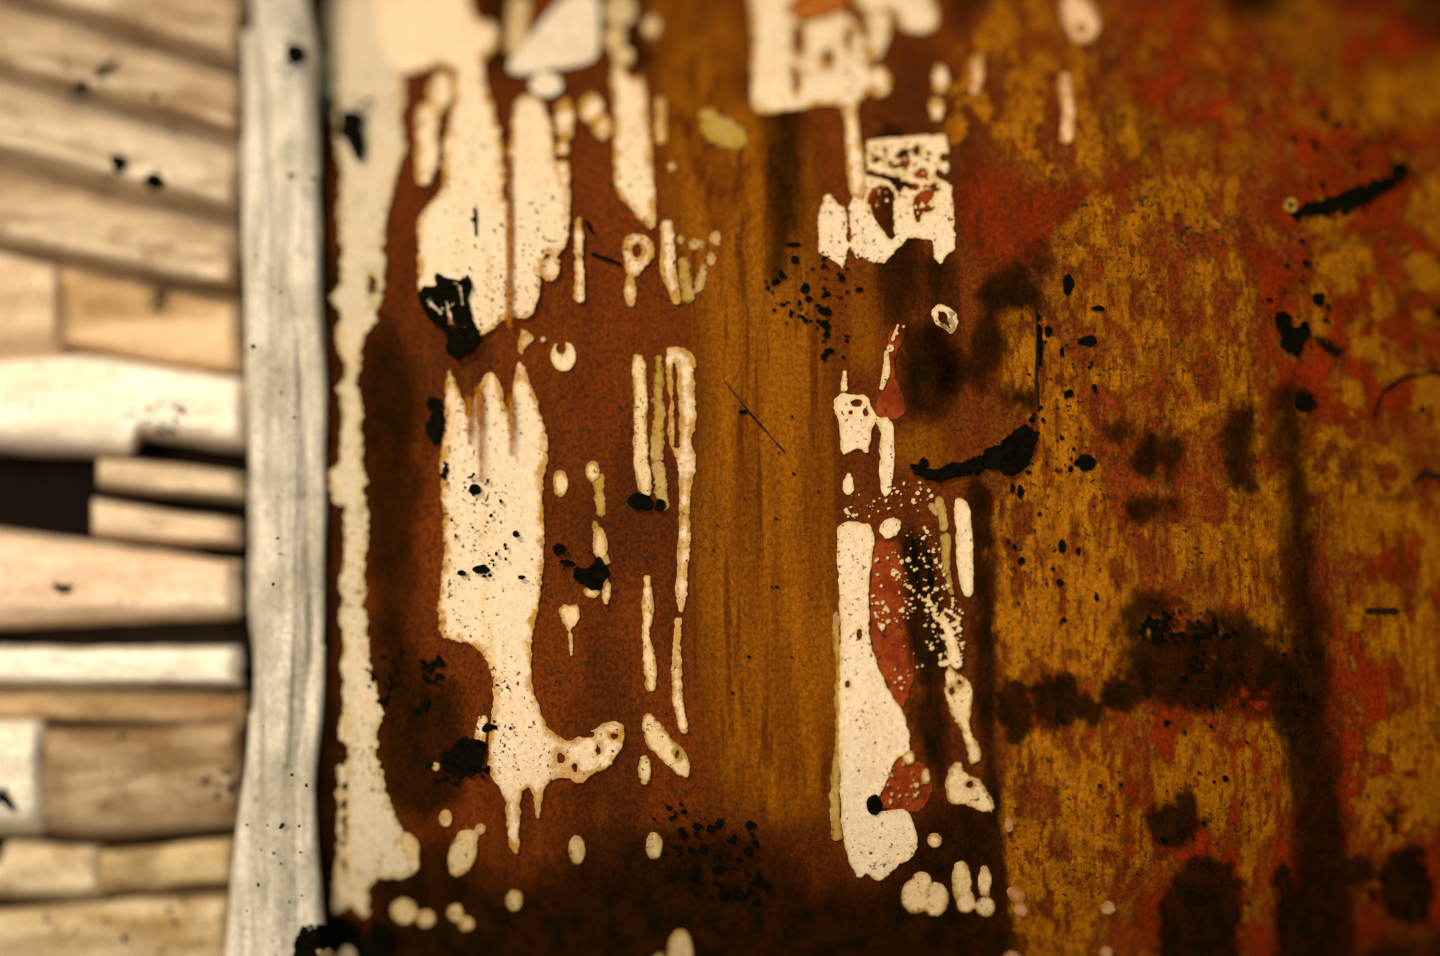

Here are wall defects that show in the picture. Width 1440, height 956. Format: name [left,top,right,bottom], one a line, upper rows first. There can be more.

rust [465,387,484,481]
rust [505,154,513,327]
peeling [322,0,721,917]
rust [666,55,832,811]
rust [791,0,847,20]
peeling [749,0,956,269]
peeling [931,304,958,334]
rust [1246,0,1440,425]
peeling [829,324,1028,917]
peeling [391,898,475,931]
peeling [654,930,693,956]
rust [1102,679,1298,956]